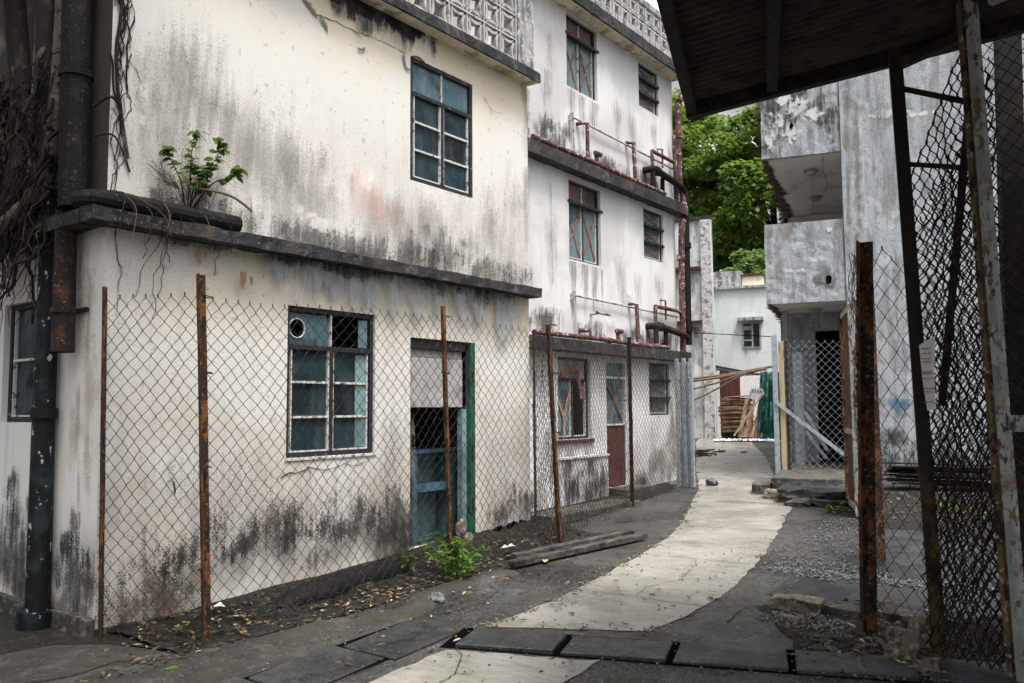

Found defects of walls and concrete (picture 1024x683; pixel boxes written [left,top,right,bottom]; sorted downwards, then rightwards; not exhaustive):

crack [317,14,405,53]
leakage [527,110,670,189]
leakage [547,435,609,506]
leakage [0,467,28,599]
leakage [54,483,415,630]